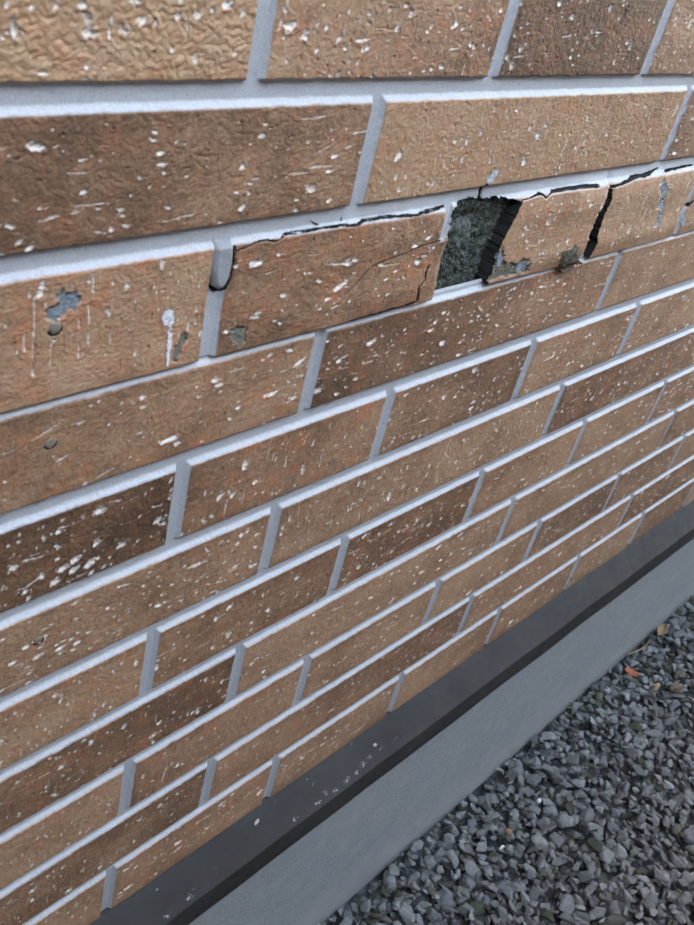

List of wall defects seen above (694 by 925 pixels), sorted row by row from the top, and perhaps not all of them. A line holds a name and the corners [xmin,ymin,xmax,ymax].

crack [522,164,692,201]
crack [235,205,444,251]
crack [344,240,440,321]
spalling [435,196,510,290]
spalling [487,244,531,282]
peeling [555,243,583,273]
spalling [45,288,81,322]